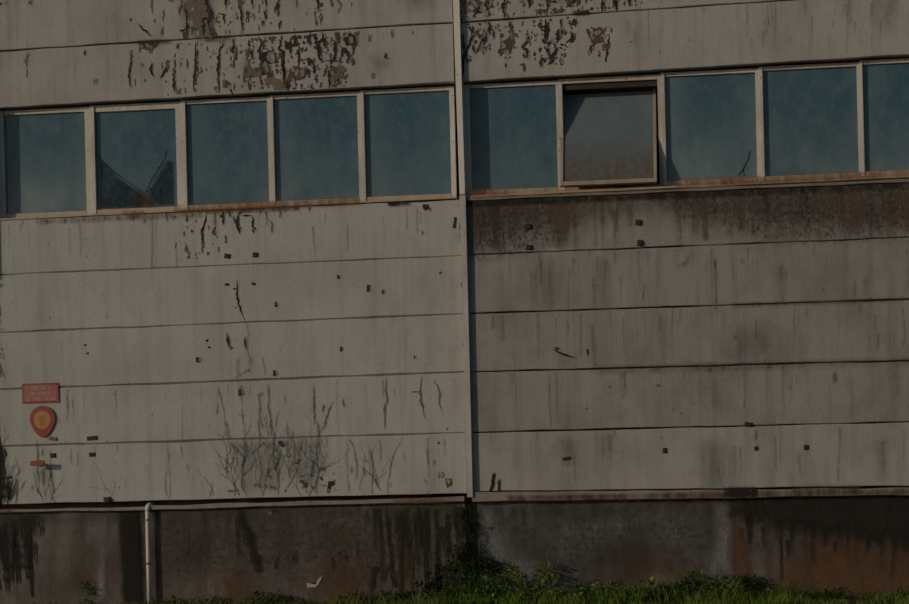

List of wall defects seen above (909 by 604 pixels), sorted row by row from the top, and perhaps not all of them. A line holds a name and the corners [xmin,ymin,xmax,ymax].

peeling [130,42,158,66]
peeling [461,0,643,65]
peeling [183,215,227,258]
water stain [466,183,909,251]
water stain [0,515,42,597]